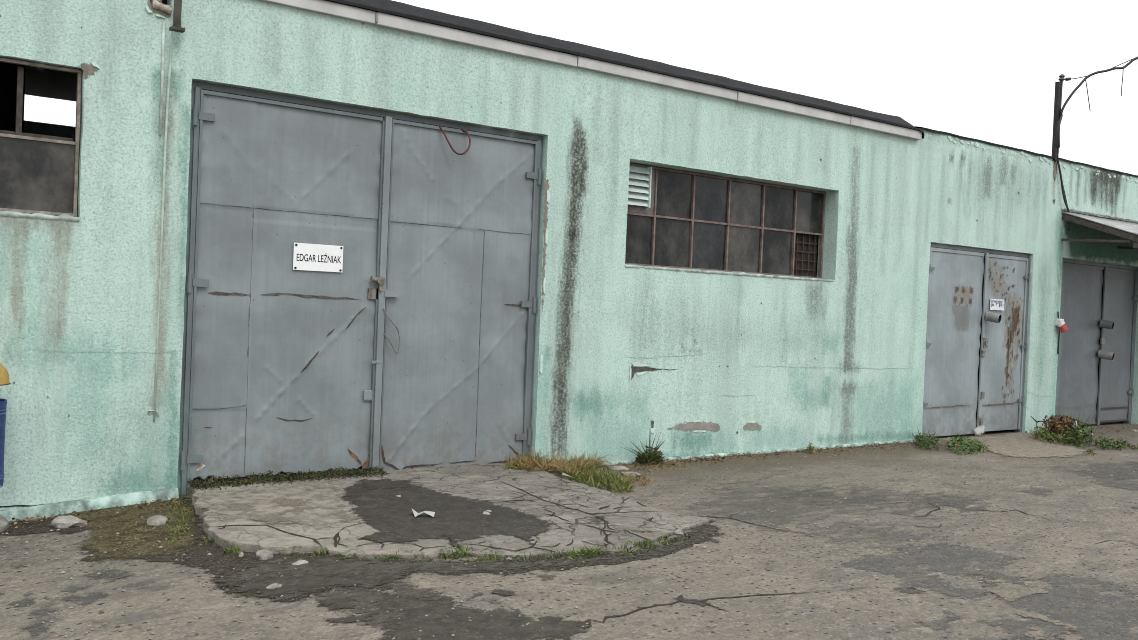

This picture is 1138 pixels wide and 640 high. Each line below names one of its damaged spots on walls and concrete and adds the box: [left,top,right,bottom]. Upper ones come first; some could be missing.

water stain [1071,170,1121,214]
water stain [552,129,586,452]
rust [953,285,973,304]
rust [989,261,1023,403]
peeling [629,362,676,380]
spalling [650,420,720,433]
spalling [737,421,762,433]
crack [267,480,662,552]
crack [581,587,864,628]